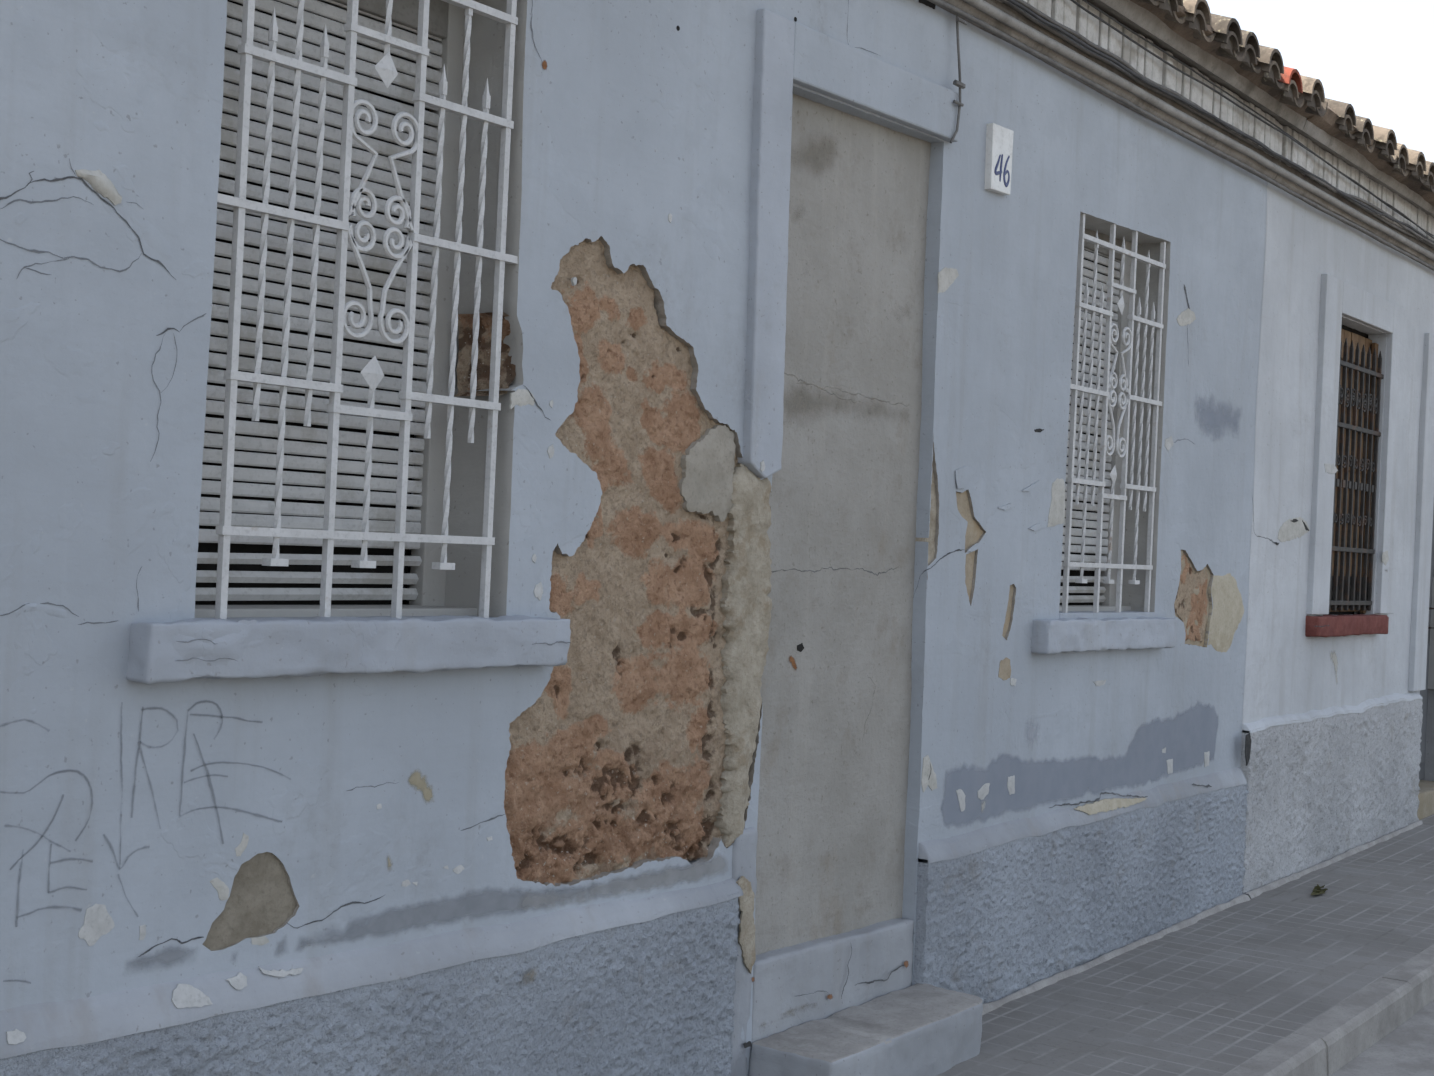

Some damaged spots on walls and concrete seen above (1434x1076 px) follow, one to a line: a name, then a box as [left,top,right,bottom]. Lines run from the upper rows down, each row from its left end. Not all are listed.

crack [0,159,174,278]
crack [150,314,205,462]
flaking render [455,312,553,409]
flaking render [487,239,772,885]
peeling [955,466,984,601]
peeling [1002,585,1014,638]
flaking render [1174,550,1244,653]
peeling [1275,517,1310,545]
peeling [998,657,1017,686]
spalling [1074,798,1147,815]
flaking render [202,833,297,950]
peeling [736,876,756,974]